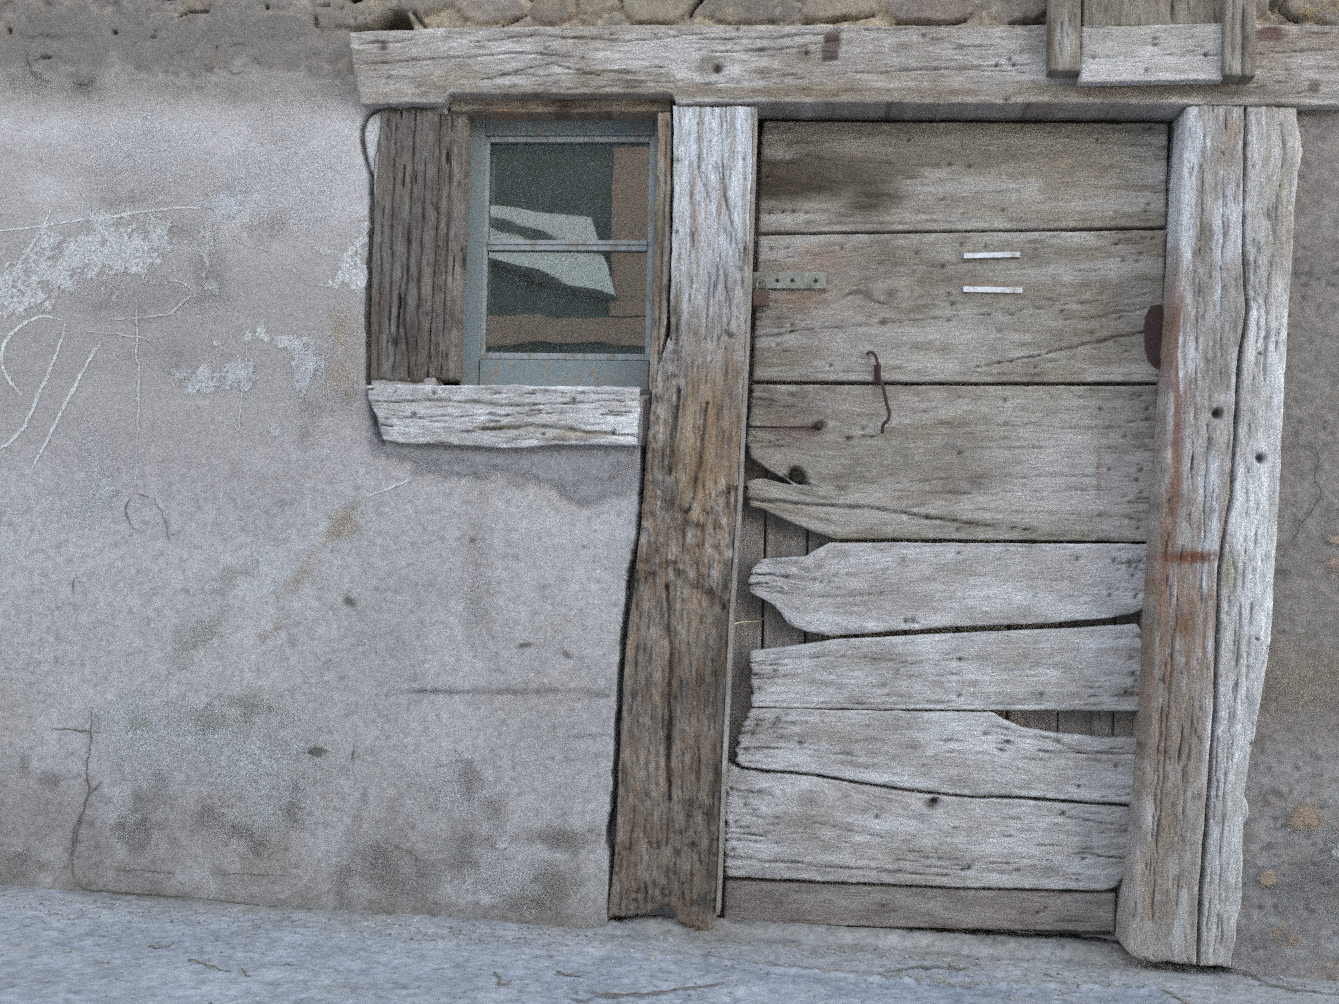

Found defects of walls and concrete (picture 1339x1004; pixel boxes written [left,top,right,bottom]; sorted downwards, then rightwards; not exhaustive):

peeling [0,205,182,320]
peeling [170,324,326,401]
crack [53,709,300,907]